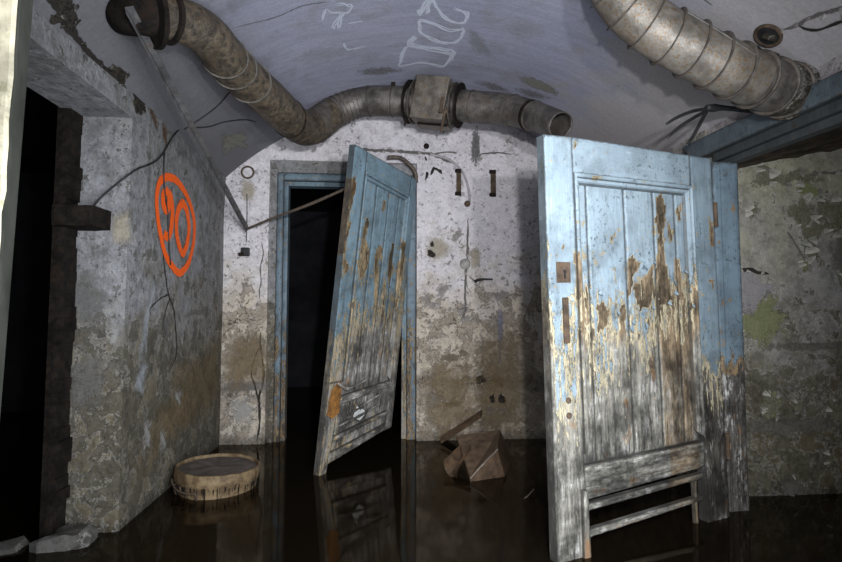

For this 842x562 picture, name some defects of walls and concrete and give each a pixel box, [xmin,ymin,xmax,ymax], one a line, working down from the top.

spalling [49,0,81,32]
spalling [108,64,130,84]
peeling [749,162,842,288]
peeling [741,264,790,348]
leakage [427,309,526,437]